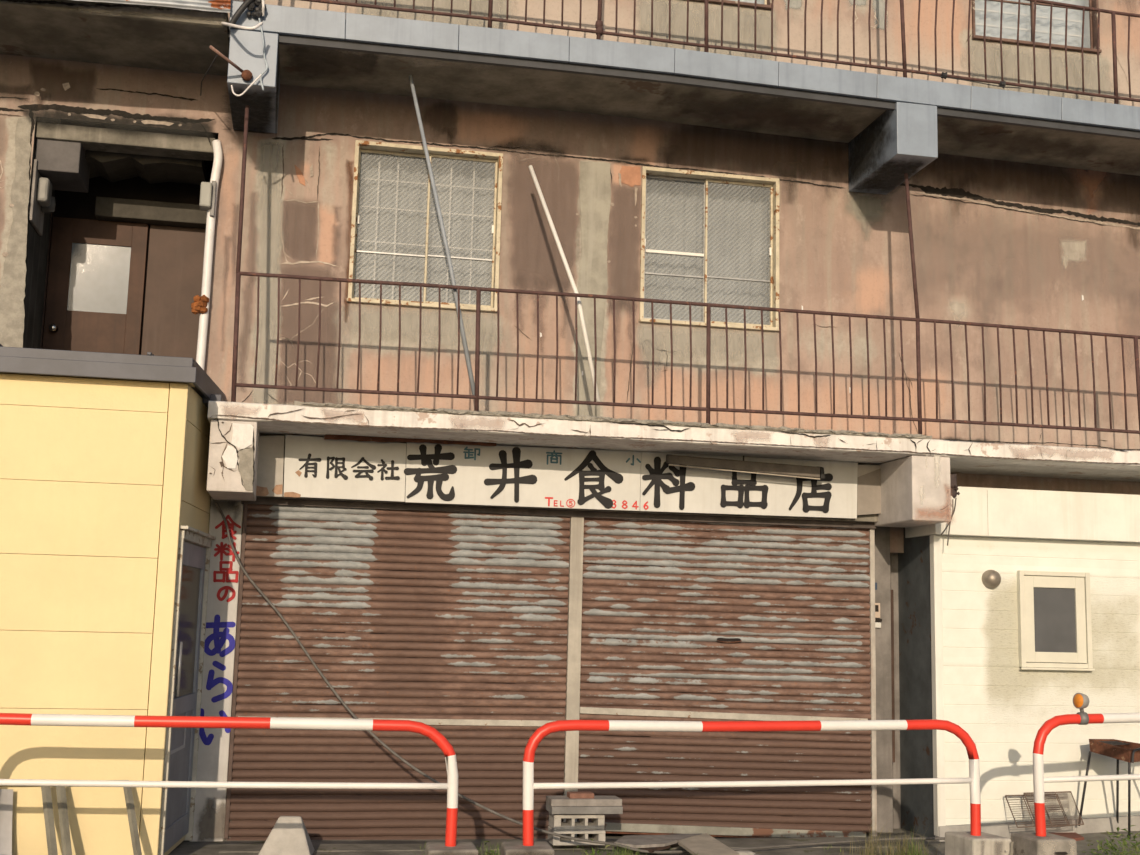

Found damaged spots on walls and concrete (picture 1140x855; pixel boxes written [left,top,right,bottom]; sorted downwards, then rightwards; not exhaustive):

water stain [1,68,212,136]
crack [0,88,214,188]
water stain [494,143,574,291]
crack [210,133,1140,490]
spalling [210,422,254,491]